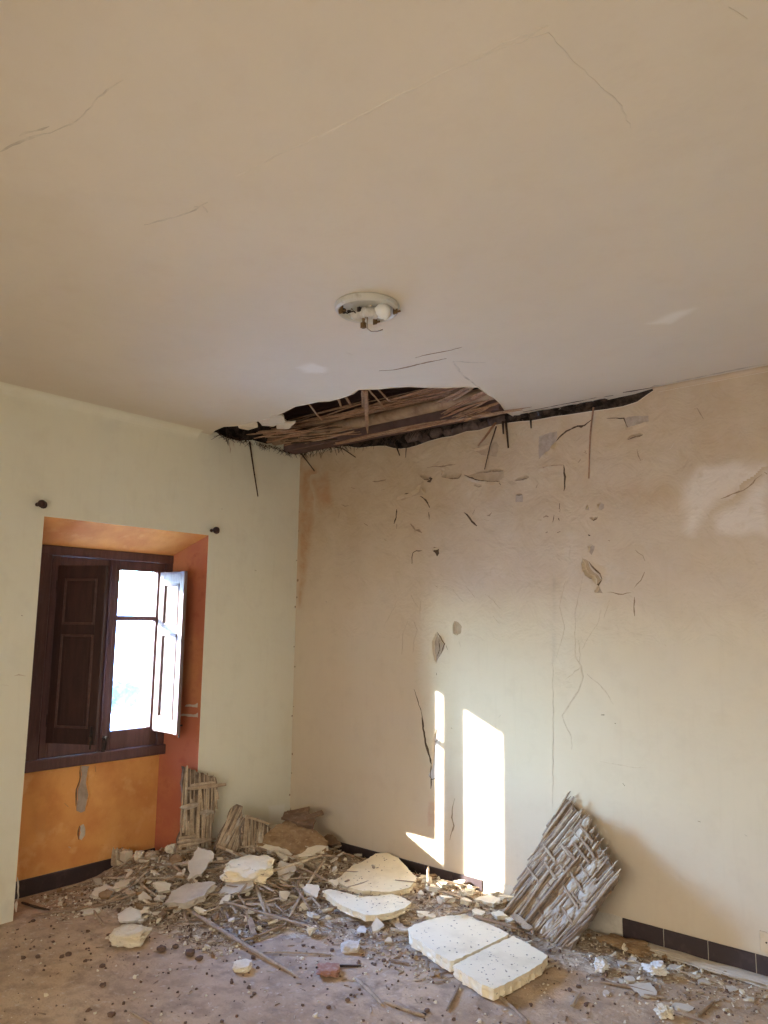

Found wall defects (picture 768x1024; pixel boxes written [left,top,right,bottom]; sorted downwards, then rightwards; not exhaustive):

crack [0,80,123,152]
crack [381,347,485,387]
crack [557,420,591,463]
peeling [581,545,602,593]
flaking render [432,621,462,663]
crack [552,553,645,805]
crack [414,690,432,786]
flaking render [75,766,90,840]